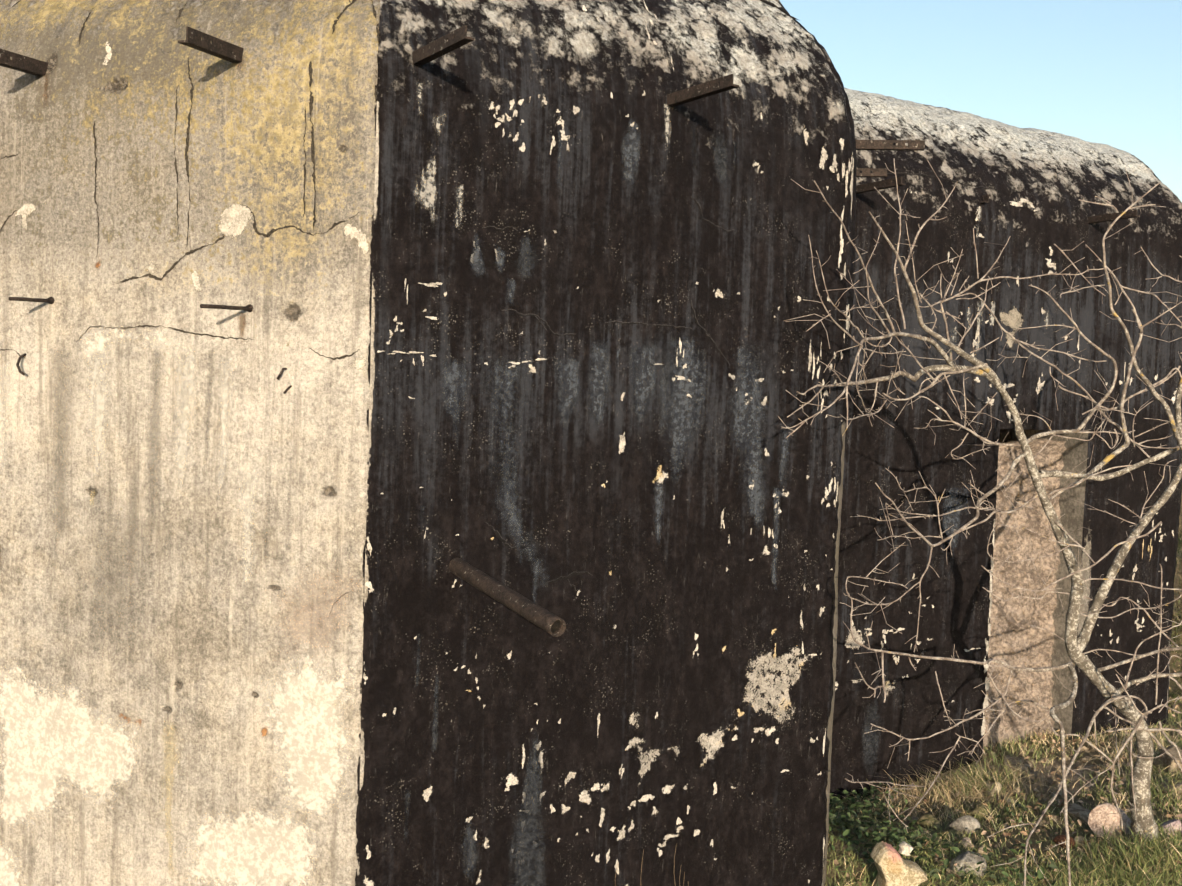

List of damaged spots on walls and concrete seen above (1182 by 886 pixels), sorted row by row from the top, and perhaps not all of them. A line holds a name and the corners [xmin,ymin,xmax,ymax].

crack [92,118,100,259]
crack [117,50,358,292]
crack [76,325,252,342]
crack [310,348,359,360]
peeling [653,465,669,484]
peeling [821,462,838,510]
peeling [749,526,778,561]
peeling [697,612,822,767]
peeling [504,719,561,812]
peeling [540,712,688,886]
peeling [657,805,717,860]